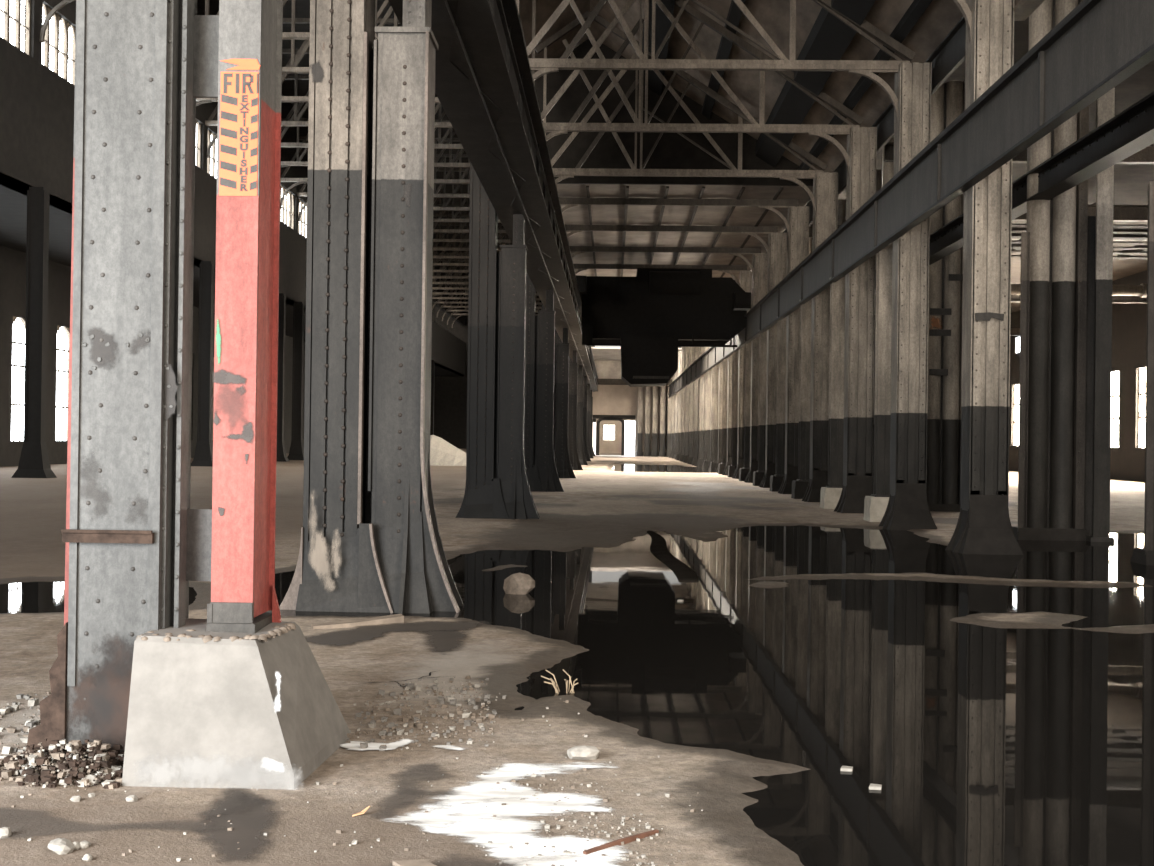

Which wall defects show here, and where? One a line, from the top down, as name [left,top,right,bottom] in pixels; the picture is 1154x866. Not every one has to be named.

peeling [213,369,254,464]
peeling [309,496,341,590]